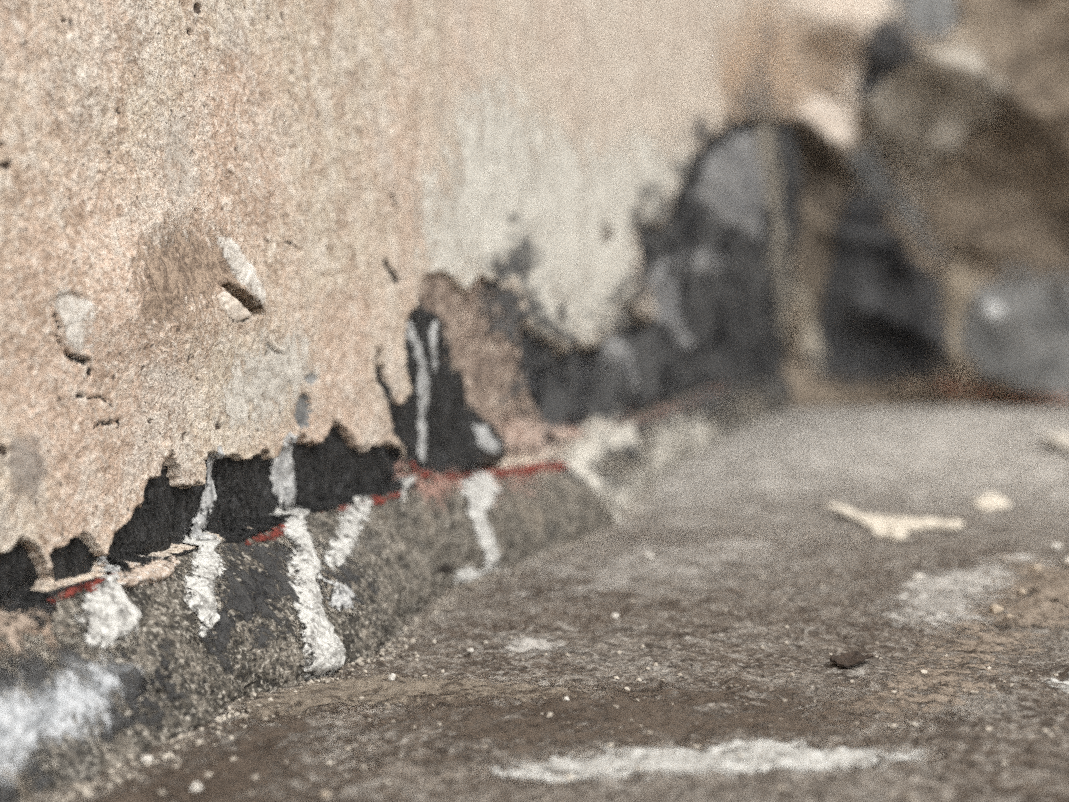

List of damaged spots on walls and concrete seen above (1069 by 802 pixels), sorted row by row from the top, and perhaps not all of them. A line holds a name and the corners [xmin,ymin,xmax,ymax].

spalling [0,88,856,654]